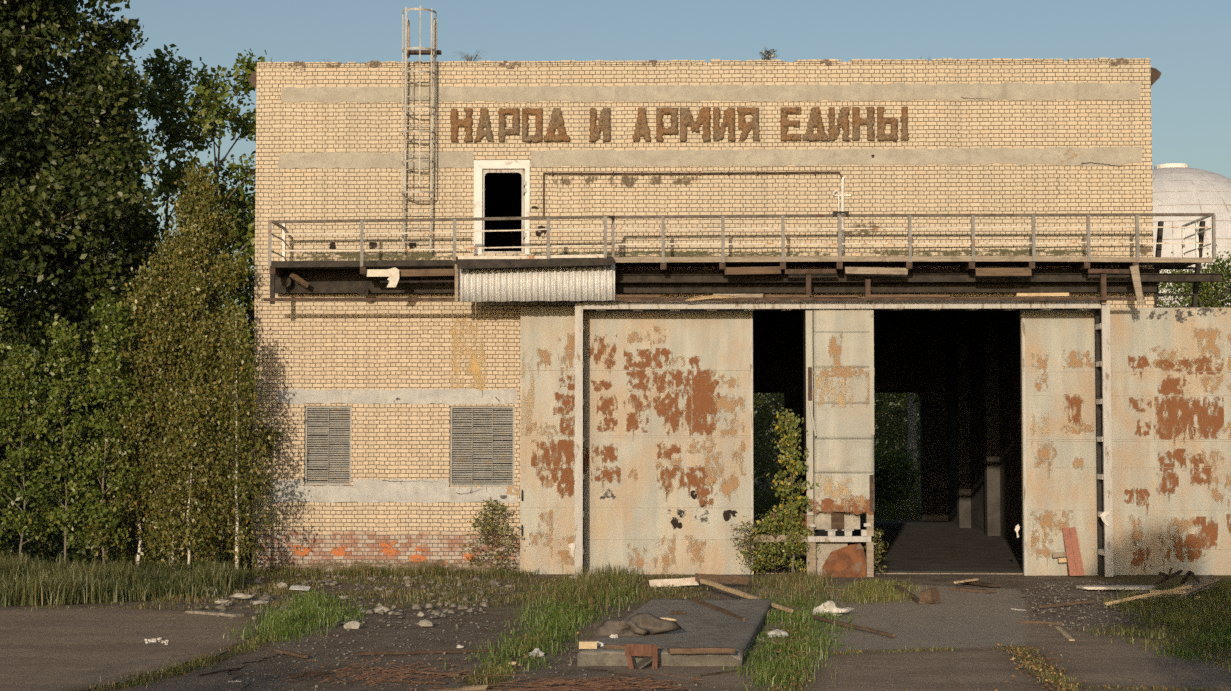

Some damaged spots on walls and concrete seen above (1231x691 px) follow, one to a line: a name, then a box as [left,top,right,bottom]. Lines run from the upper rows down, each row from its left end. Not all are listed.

corrosion [814,332,870,408]
corrosion [1032,355,1048,391]
corrosion [1063,350,1095,369]
corrosion [521,326,746,508]
corrosion [1032,394,1094,477]
corrosion [1124,328,1231,571]
corrosion [787,476,873,534]
corrosion [529,510,575,572]
corrosion [1030,511,1073,565]